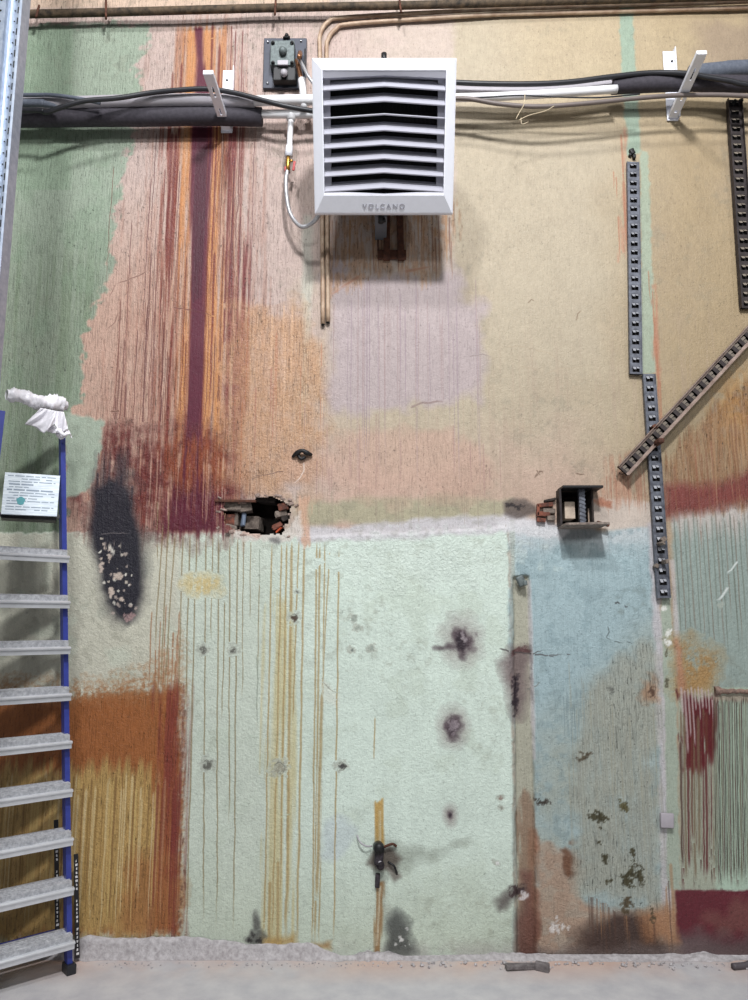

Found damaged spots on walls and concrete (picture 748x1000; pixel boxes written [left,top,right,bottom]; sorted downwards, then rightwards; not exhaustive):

rust [140,14,257,95]
rust [89,126,272,558]
rust [66,493,90,543]
spalling [215,493,306,546]
damp [154,259,506,952]
rust [0,604,195,943]
damp [563,636,669,921]
rust [512,627,730,954]